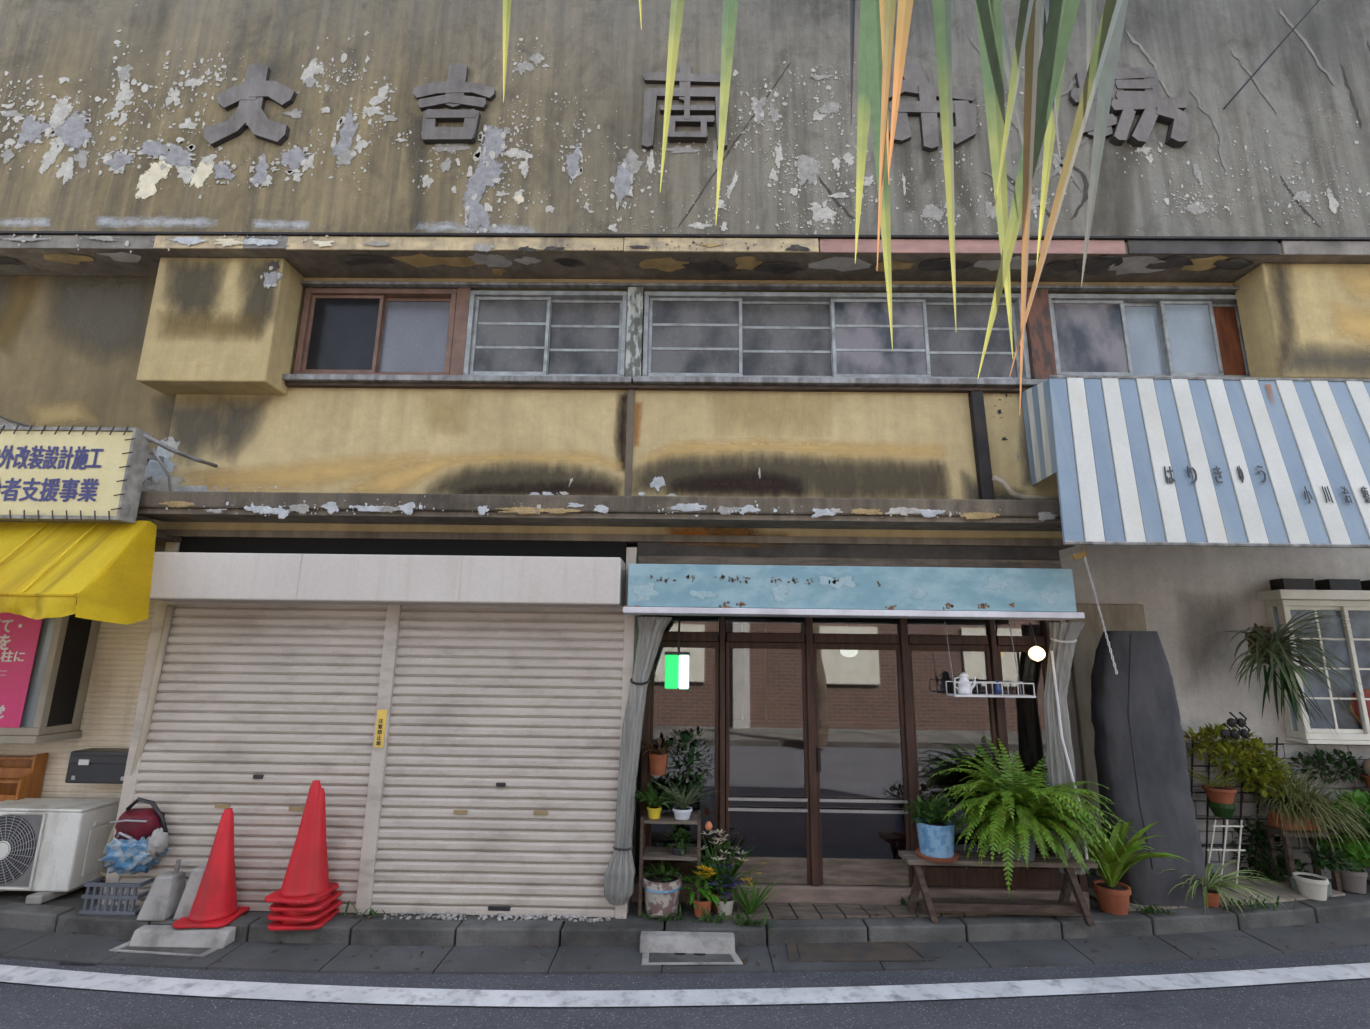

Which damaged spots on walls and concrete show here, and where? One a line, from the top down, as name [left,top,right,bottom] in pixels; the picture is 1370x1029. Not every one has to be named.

peeling [0,30,1254,289]
damp [54,276,148,352]
damp [37,405,87,425]
damp [206,455,618,495]
peeling [472,478,623,515]
damp [635,442,947,499]
peeling [638,476,1001,520]
damp [966,482,1019,500]
damp [1023,423,1031,482]
peeling [1038,511,1057,521]